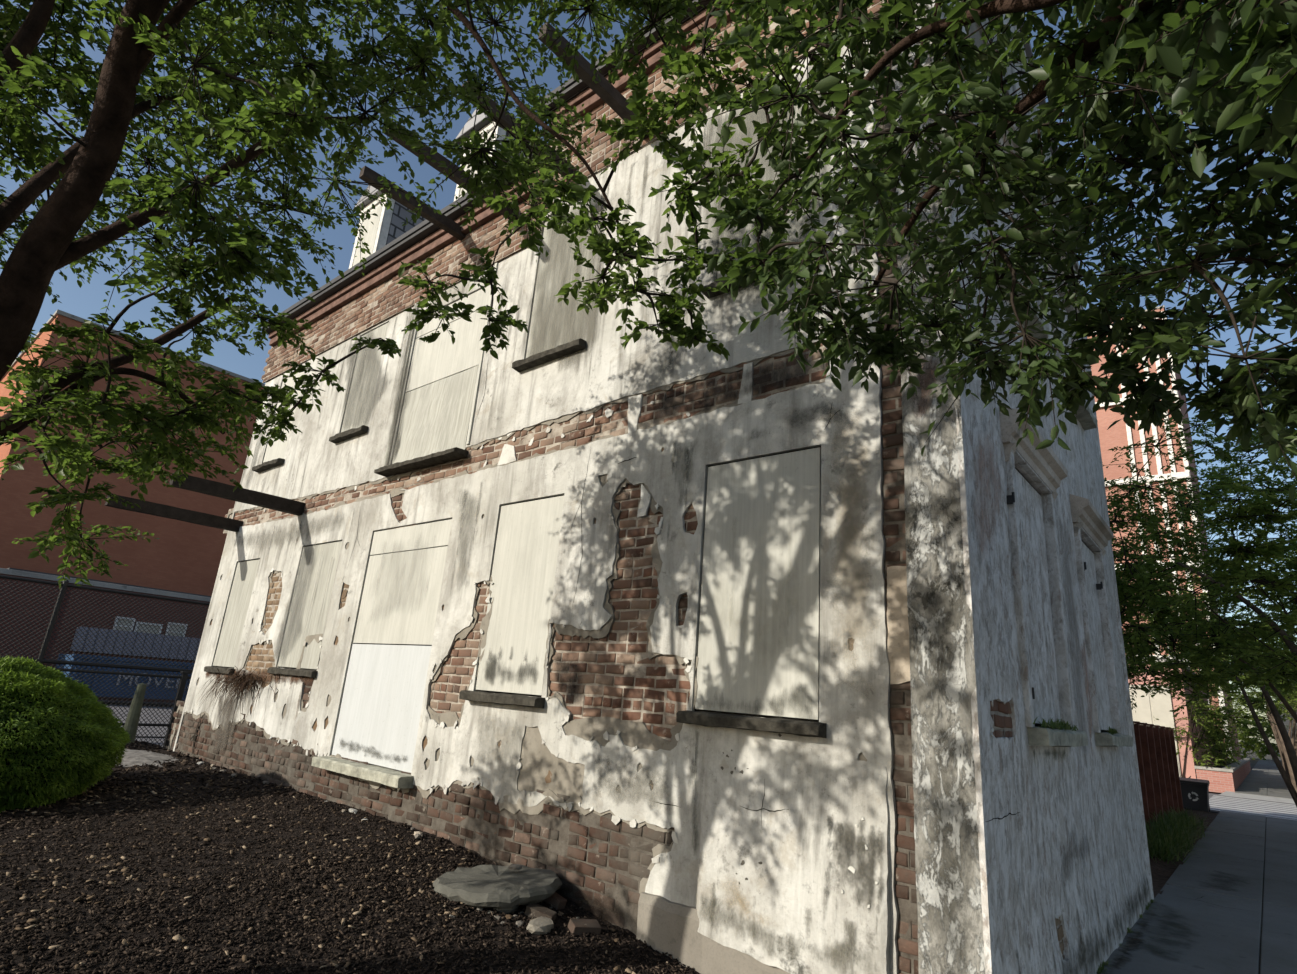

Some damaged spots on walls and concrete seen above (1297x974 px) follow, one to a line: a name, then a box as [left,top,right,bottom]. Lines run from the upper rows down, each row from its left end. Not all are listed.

peeling [0,568,694,974]
flaking render [223,342,828,535]
spalling [544,475,701,789]
water stain [828,818,883,903]
flaking render [877,187,919,974]
spalling [990,699,1016,744]